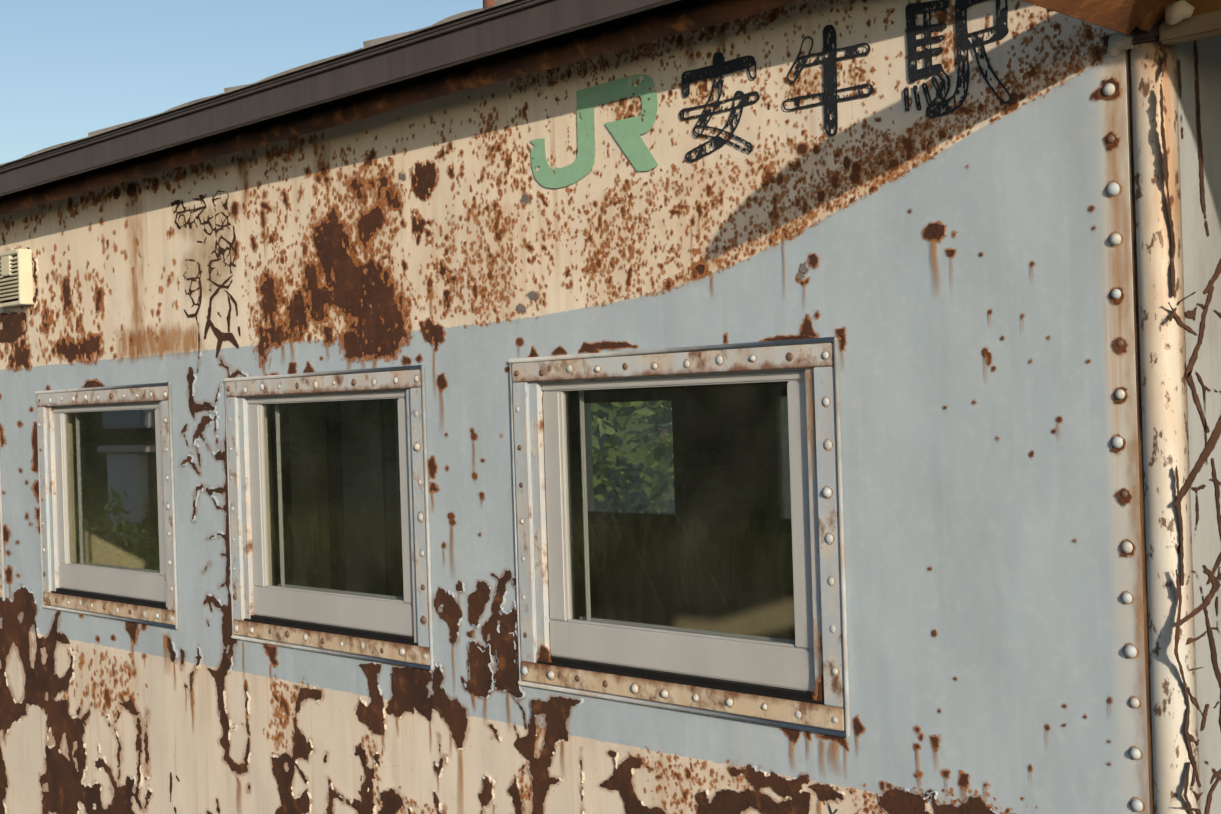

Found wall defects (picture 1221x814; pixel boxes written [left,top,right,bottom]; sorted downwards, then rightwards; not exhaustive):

corrosion [1091,77,1122,100]
crack [171,190,241,373]
corrosion [0,0,1115,410]
corrosion [1109,288,1125,304]
corrosion [428,456,448,502]
corrosion [470,428,485,502]
crack [1159,40,1221,814]
peeling [164,351,251,814]
peeling [0,585,152,814]
peeling [270,570,584,814]
peeling [600,750,666,814]
peeling [695,764,845,814]